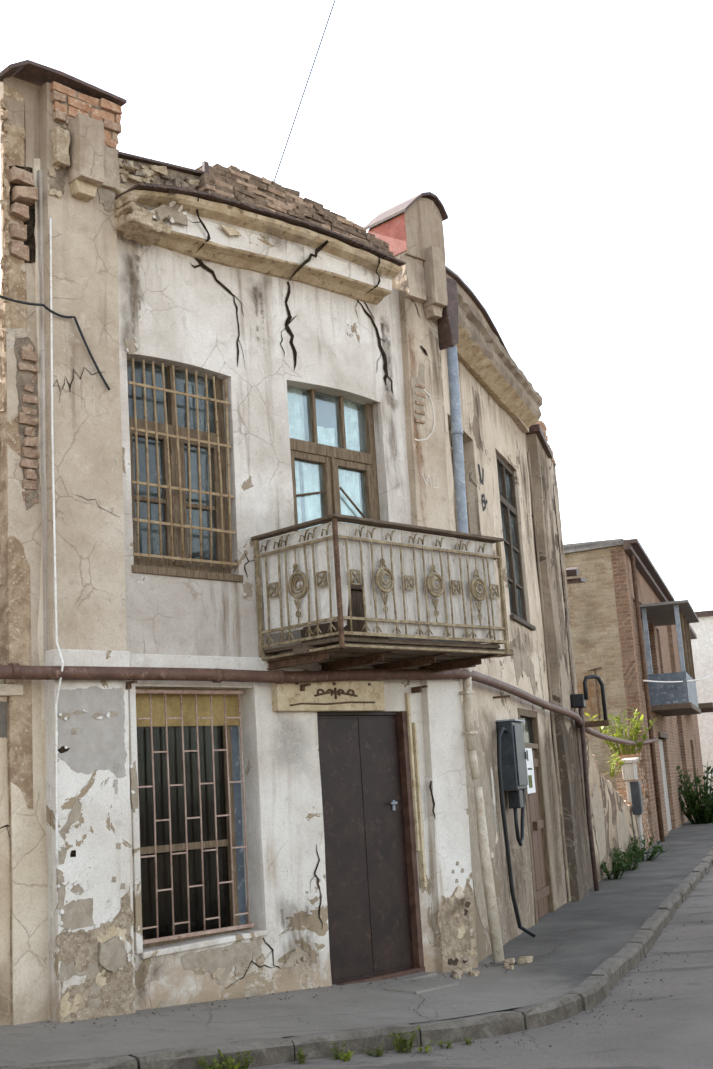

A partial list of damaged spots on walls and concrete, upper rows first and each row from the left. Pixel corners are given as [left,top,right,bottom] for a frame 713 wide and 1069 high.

crack [187,196,245,366]
crack [280,240,329,370]
crack [355,256,393,393]
spalling [55,799,135,1023]
spalling [181,937,265,986]
crack [226,937,281,989]
crack [310,844,323,927]
spalling [436,701,498,970]